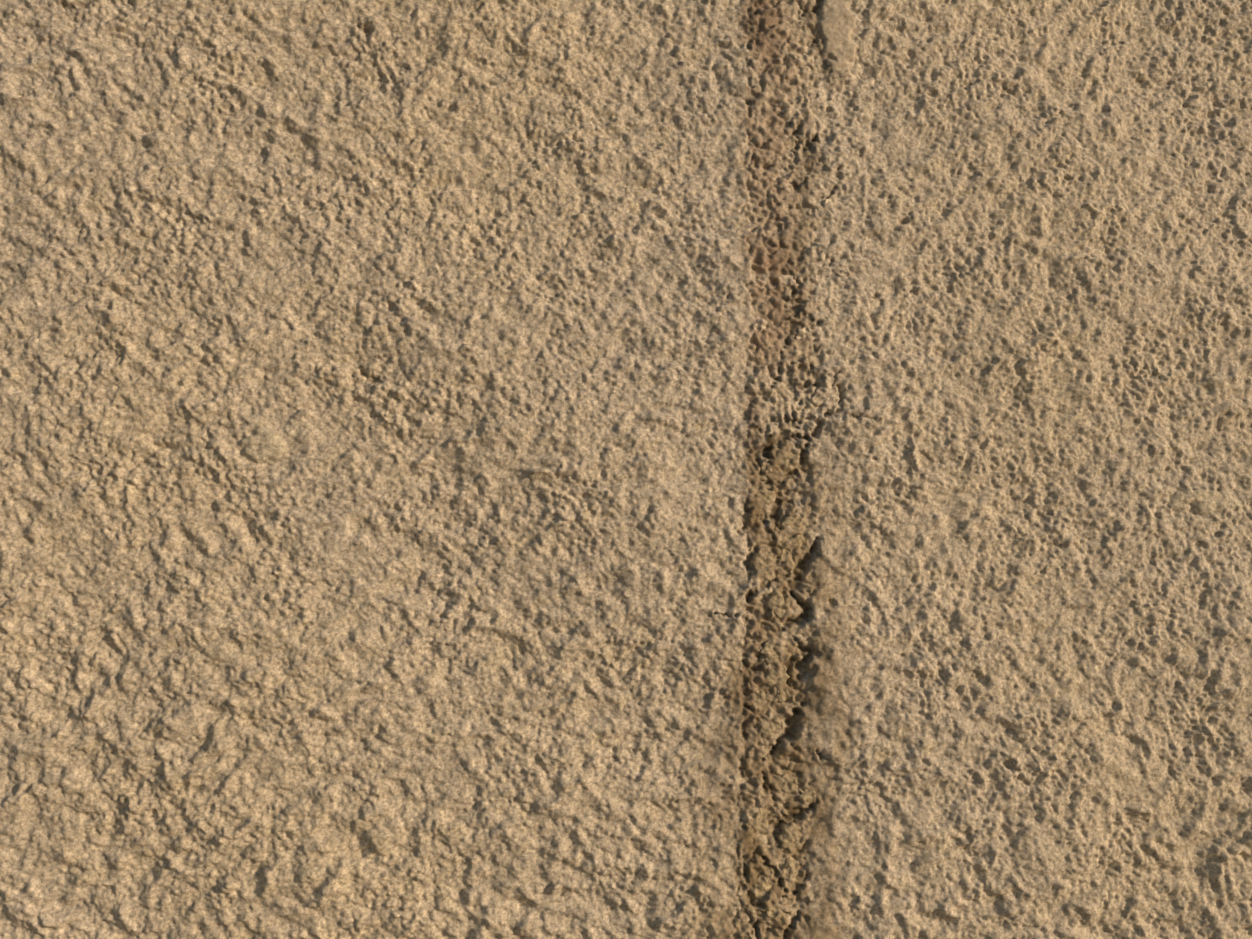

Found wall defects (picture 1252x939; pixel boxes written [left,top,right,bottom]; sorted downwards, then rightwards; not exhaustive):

crack [756,411,838,517]
crack [737,548,812,825]